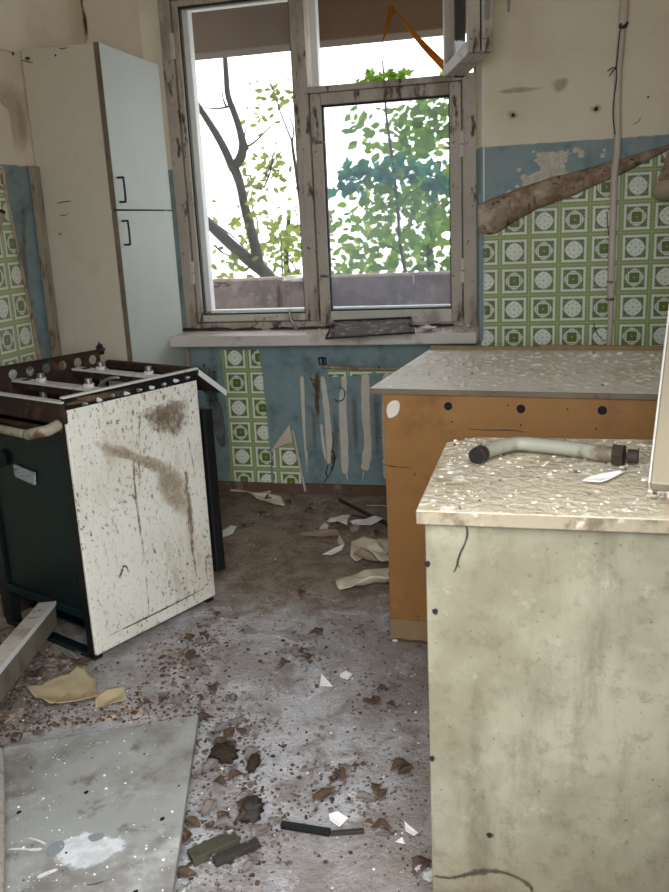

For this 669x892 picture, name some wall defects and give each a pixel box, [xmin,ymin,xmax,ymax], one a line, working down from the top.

peeling [505,147,585,193]
peeling [300,376,308,474]
peeling [320,376,349,480]
peeling [361,374,386,481]